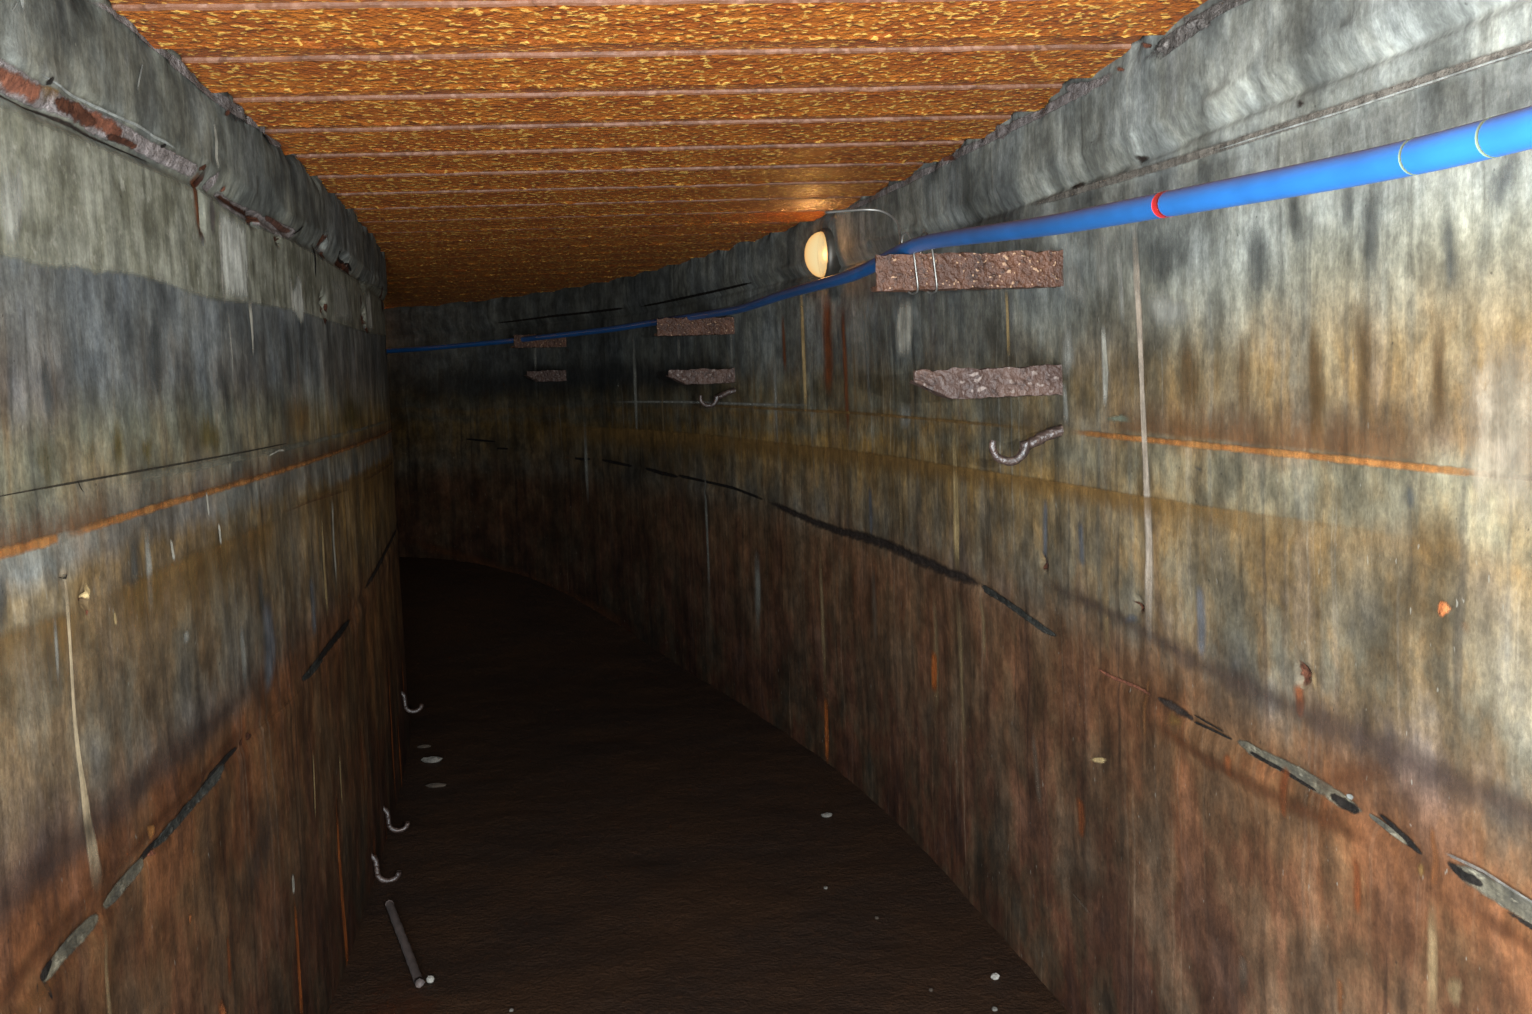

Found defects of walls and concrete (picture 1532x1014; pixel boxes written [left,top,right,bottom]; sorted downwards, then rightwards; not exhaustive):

water stain [1346,193,1376,256]
water stain [1063,334,1073,368]
water stain [1084,243,1532,599]
crack [575,457,1056,636]
rust [1438,602,1450,616]
crack [37,620,350,999]
crack [1099,669,1532,930]